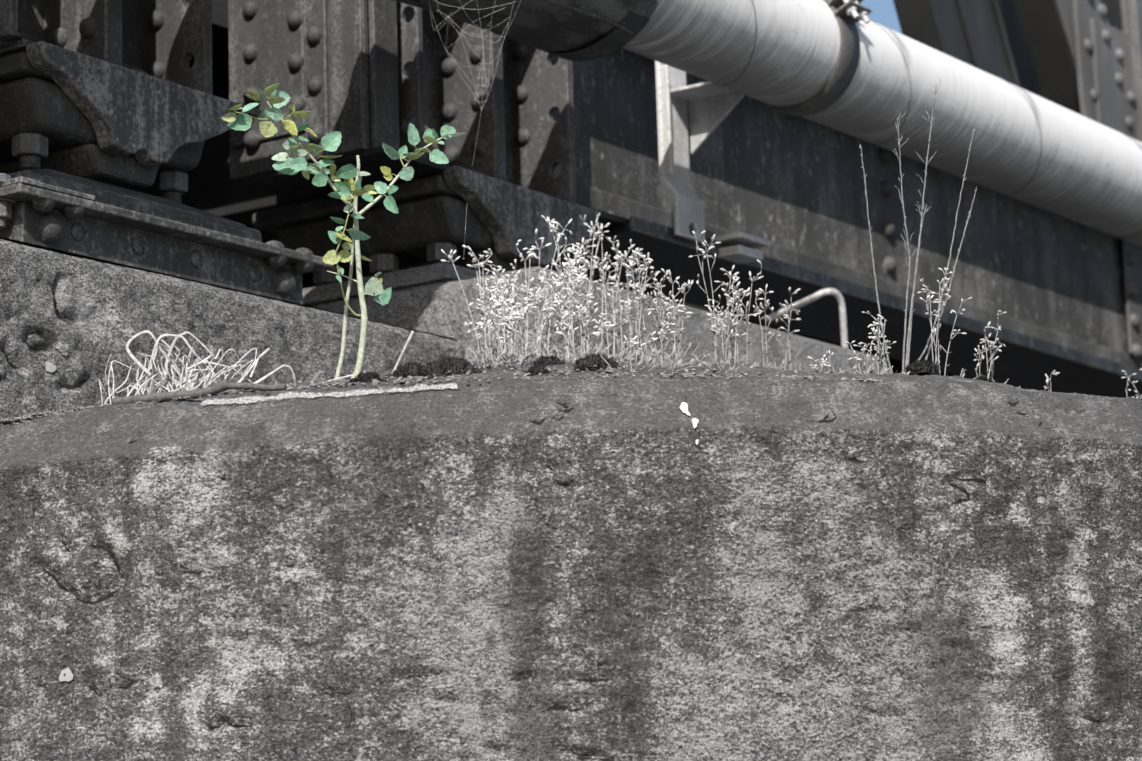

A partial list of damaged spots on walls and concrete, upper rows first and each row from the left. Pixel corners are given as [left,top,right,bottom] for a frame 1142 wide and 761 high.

water stain [1046,485,1100,733]